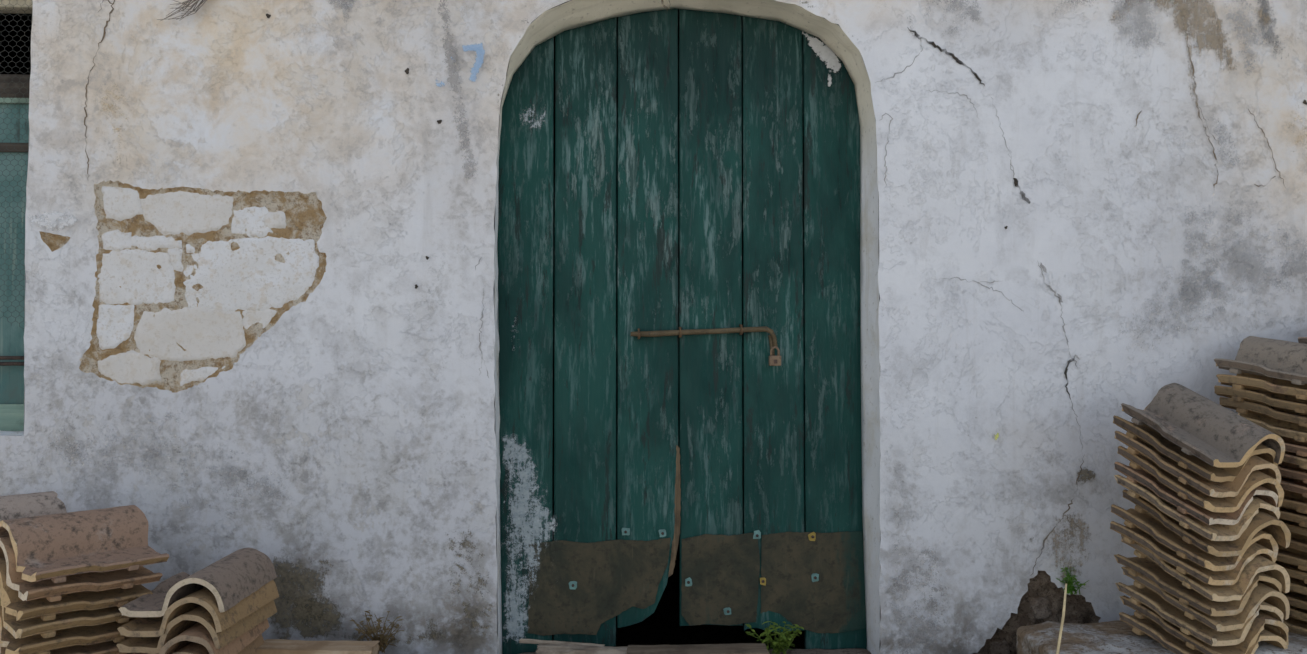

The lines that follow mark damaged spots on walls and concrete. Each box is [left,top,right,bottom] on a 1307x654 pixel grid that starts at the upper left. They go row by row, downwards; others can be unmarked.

crack [84,0,115,177]
damp [438,0,476,178]
crack [893,28,1030,204]
crack [1185,32,1219,186]
crack [1248,109,1286,188]
peeling [29,212,77,252]
spalling [79,180,327,393]
crack [1039,263,1080,426]
crack [1031,459,1084,575]
spalling [973,570,1101,654]